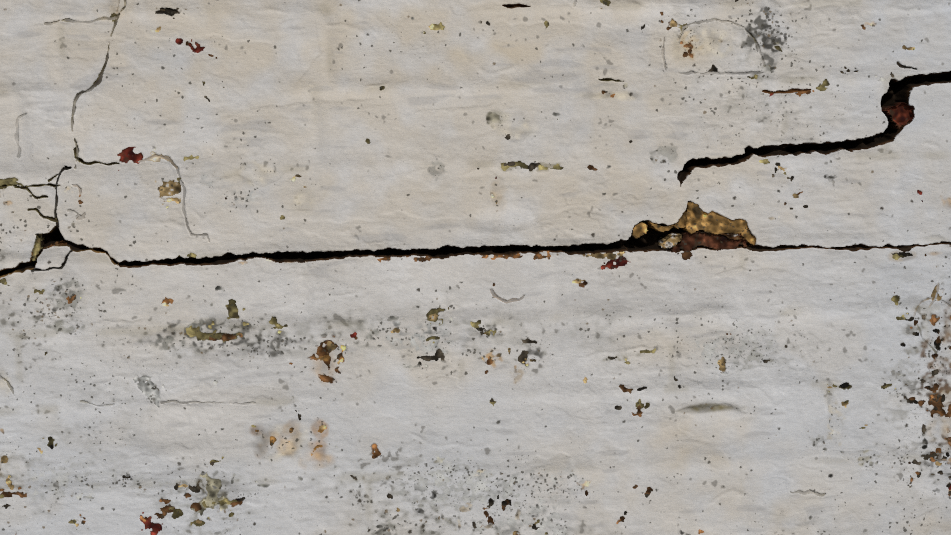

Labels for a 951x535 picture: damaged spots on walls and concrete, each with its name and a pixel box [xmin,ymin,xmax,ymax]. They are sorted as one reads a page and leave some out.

crack [661,12,830,97]
crack [571,78,643,103]
crack [0,0,629,288]
crack [677,61,951,186]
spalling [623,201,756,260]
crack [746,241,951,252]
peeling [886,249,944,263]
crack [913,278,951,317]
crack [127,375,256,407]
peeling [881,283,951,496]
peeling [0,454,40,499]
peeling [139,456,245,535]